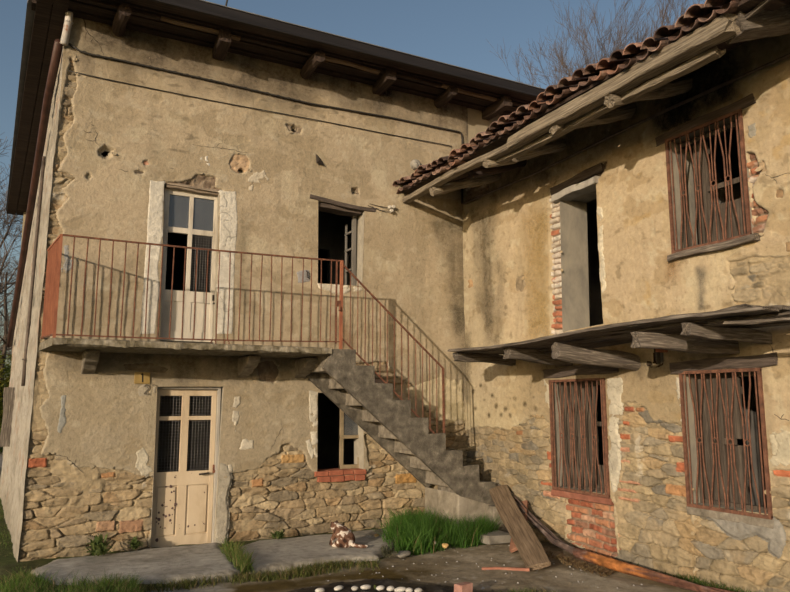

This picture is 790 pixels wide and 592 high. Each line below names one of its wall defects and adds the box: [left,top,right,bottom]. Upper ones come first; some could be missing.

flaking render [229,152,251,173]
flaking render [747,154,769,236]
flaking render [18,54,205,562]
flaking render [728,242,790,306]
flaking render [223,390,438,543]
flaking render [424,377,790,592]